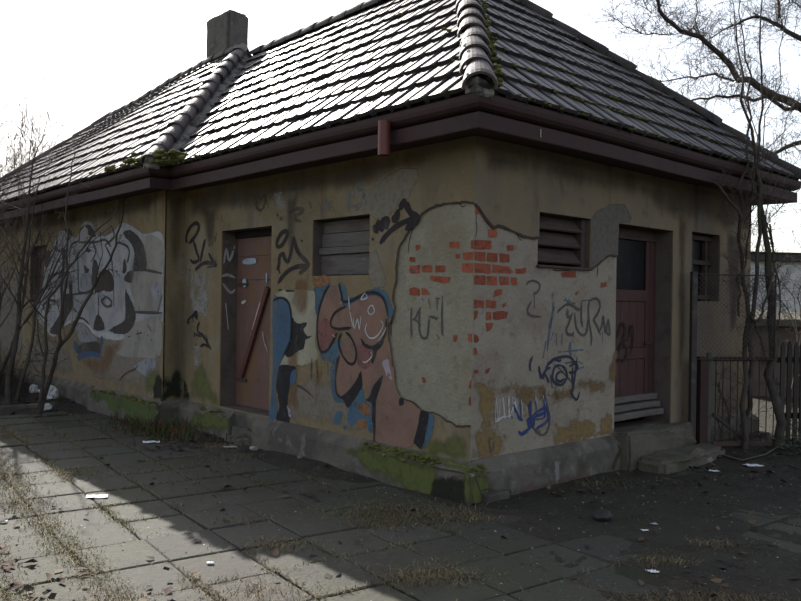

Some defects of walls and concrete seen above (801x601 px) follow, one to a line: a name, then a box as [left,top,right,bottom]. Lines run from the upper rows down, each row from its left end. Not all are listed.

flaking render [390,203,618,461]
damp [431,477,466,504]